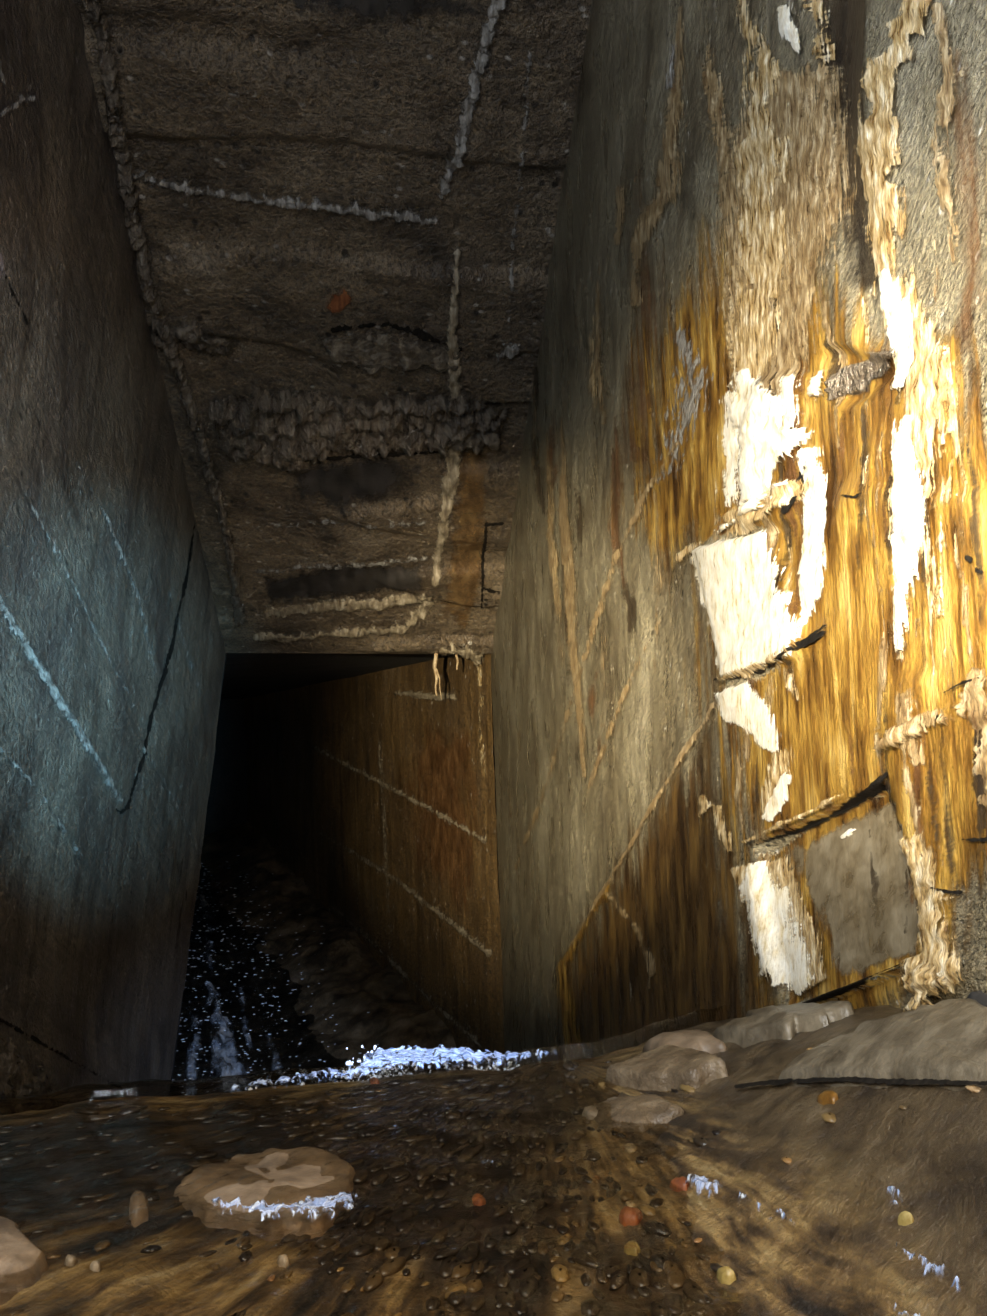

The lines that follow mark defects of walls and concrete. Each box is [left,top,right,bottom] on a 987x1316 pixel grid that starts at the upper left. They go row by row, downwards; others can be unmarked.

crack [0,266,28,325]
spalling [824,351,892,400]
water stain [295,458,419,509]
water stain [266,565,421,601]
crack [965,555,983,574]
crack [116,519,197,814]
spalling [676,466,809,822]
spalling [728,802,919,996]